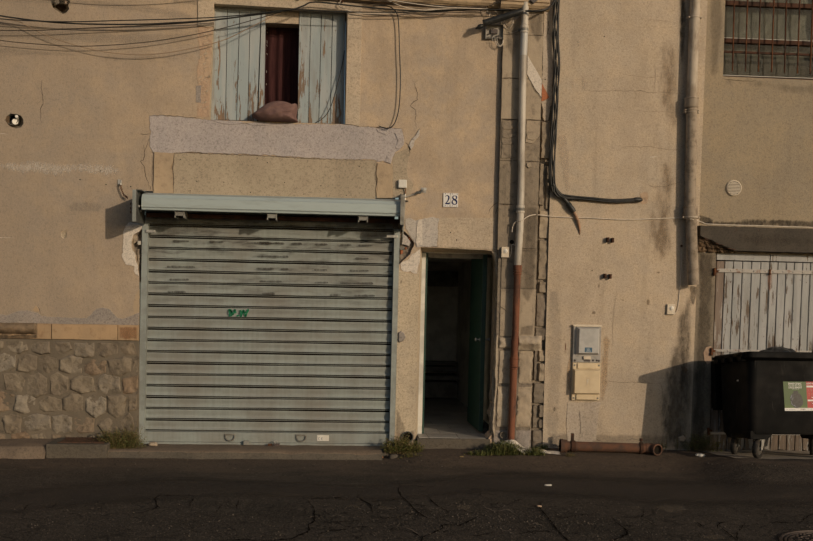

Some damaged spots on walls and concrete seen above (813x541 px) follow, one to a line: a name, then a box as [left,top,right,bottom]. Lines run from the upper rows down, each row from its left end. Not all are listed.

spalling [196,27,213,117]
spalling [132,229,142,313]
damp [665,255,712,444]